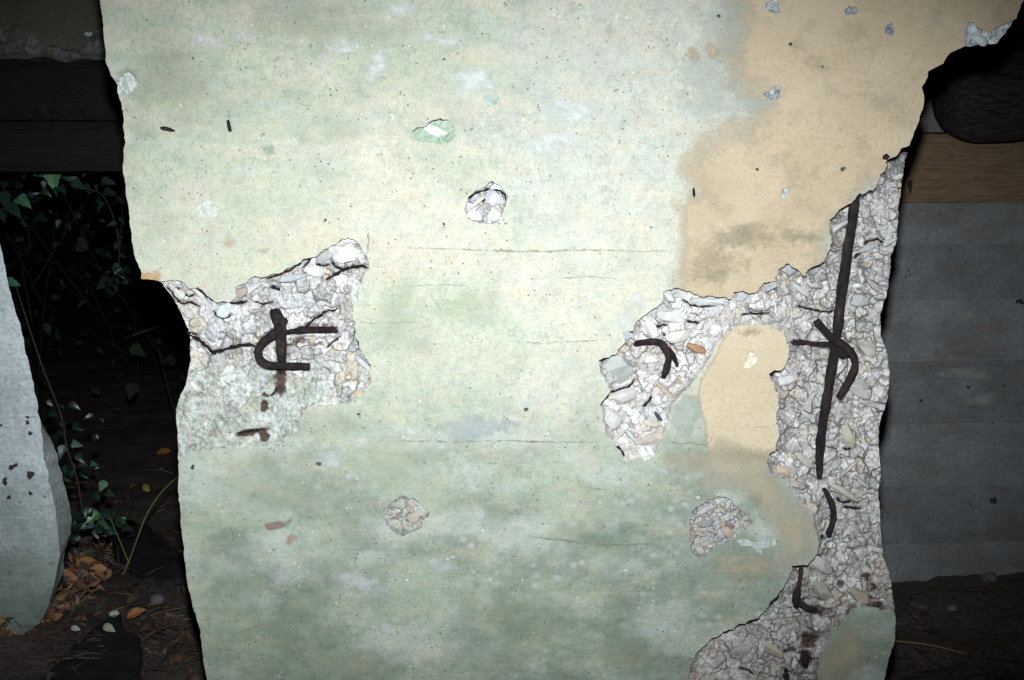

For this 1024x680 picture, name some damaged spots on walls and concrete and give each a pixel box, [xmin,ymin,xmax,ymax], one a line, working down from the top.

peeling [412,118,456,145]
spalling [465,181,508,224]
leakage [680,0,1023,299]
spalling [158,238,372,470]
spalling [382,496,429,536]
spalling [599,146,909,680]
leakage [698,324,814,561]